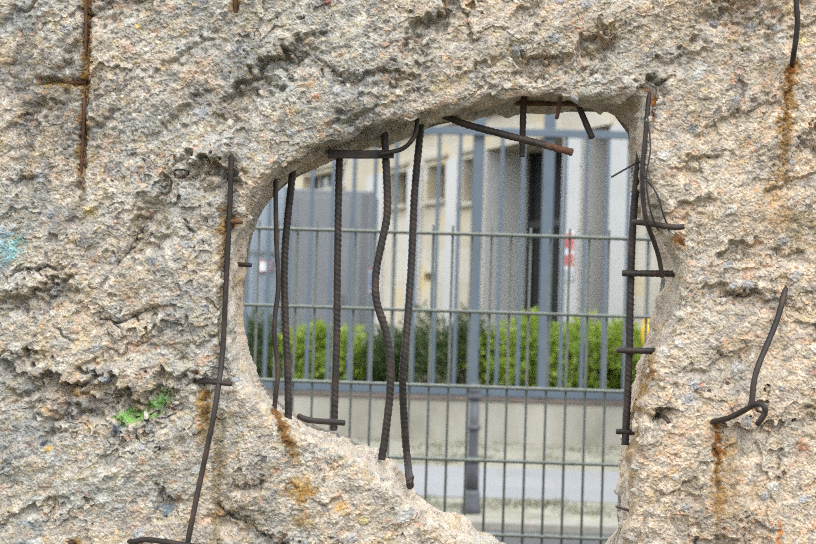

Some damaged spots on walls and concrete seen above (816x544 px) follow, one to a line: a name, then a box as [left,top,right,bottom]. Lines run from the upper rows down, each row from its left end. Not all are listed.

corrosion [38,0,92,188]
spalling [442,27,615,157]
corrosion [777,59,801,159]
spalling [265,118,424,489]
spalling [616,75,685,445]
corrosion [195,389,211,433]
corrosion [271,409,299,456]
corrosion [287,477,319,506]
corrosion [710,423,727,508]